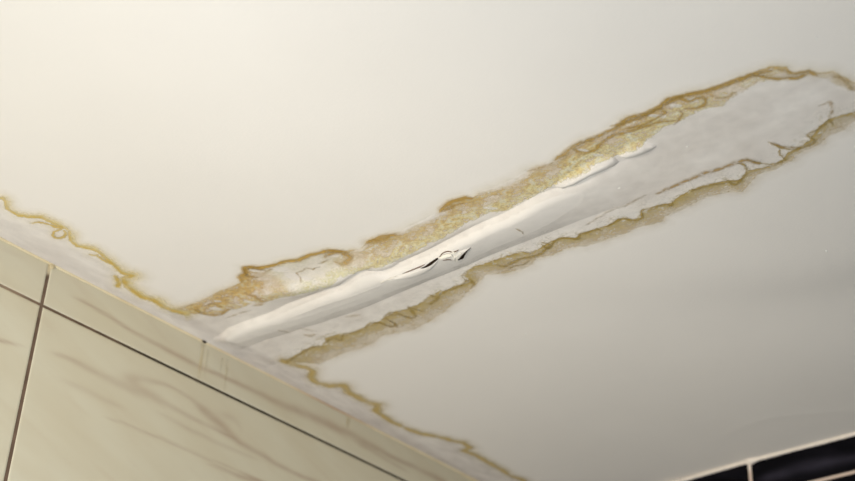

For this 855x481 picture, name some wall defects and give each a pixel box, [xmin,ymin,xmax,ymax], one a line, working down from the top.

damp [0,66,829,316]
crack [381,248,470,284]
damp [280,112,855,481]